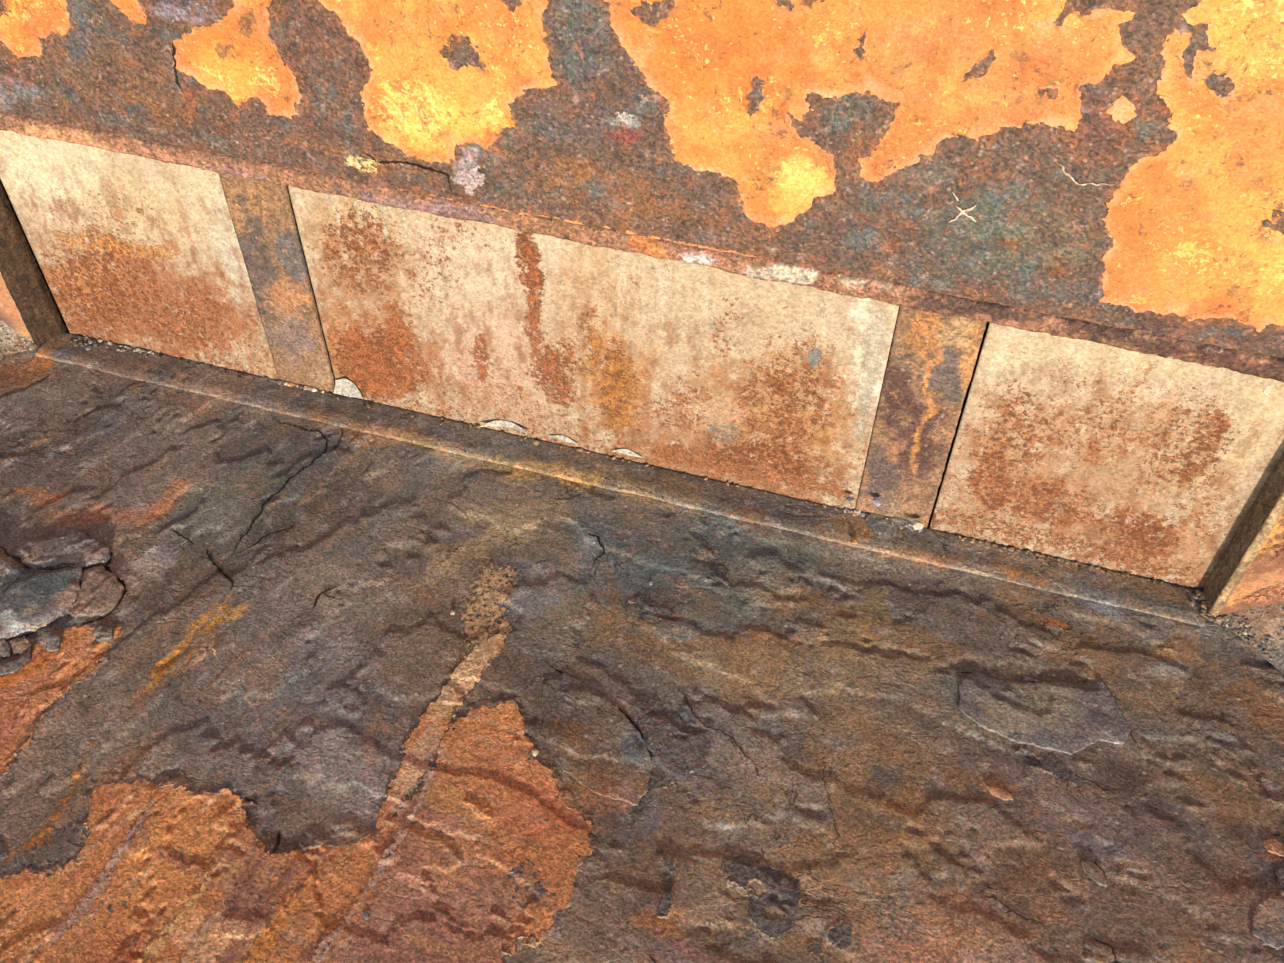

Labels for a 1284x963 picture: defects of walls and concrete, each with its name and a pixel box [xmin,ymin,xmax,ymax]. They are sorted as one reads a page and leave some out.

rust [53,229,178,262]
rust [334,234,573,429]
rust [585,326,637,436]
peeling [0,627,62,659]
crack [0,533,128,625]
peeling [92,625,114,642]
crack [170,414,343,590]
crack [312,586,338,609]
rust [865,512,912,540]
rust [944,509,1187,582]